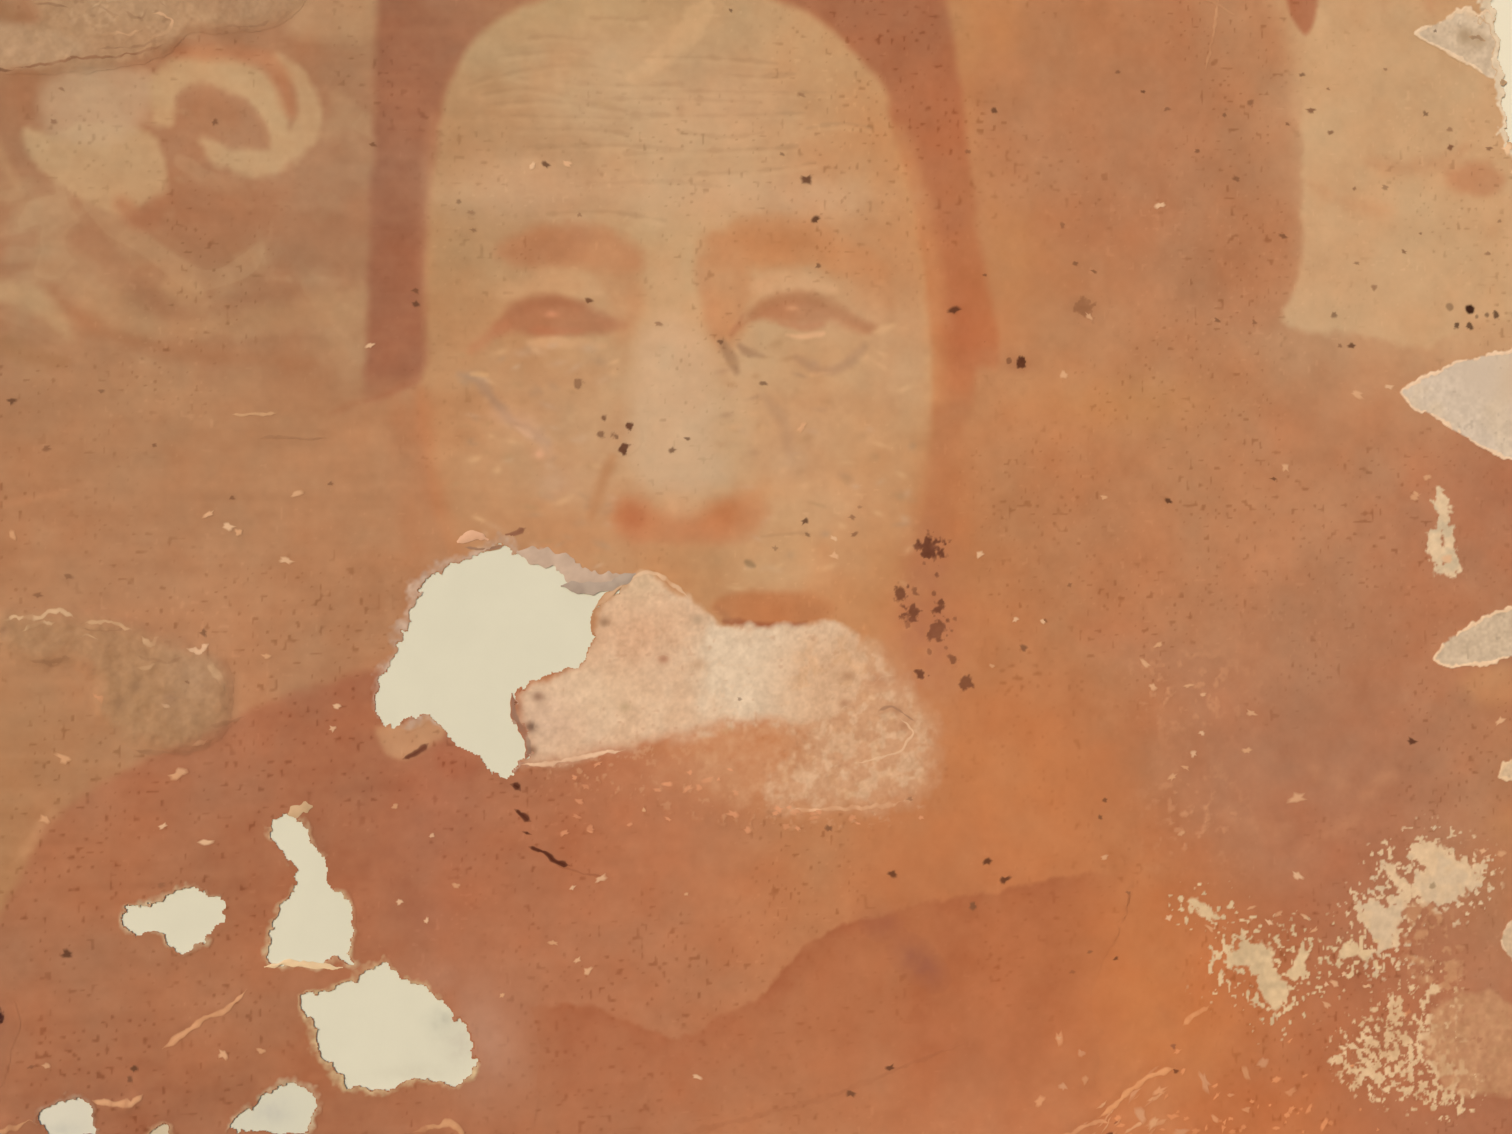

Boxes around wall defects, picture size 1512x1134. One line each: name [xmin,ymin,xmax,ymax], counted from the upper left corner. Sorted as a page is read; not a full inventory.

crack [0,43,167,73]
peeling [1414,5,1497,79]
peeling [1384,346,1512,460]
peeling [1409,474,1464,580]
flaking render [375,543,621,779]
peeling [1432,605,1512,669]
peeling [1497,758,1512,782]
flaking render [121,887,226,954]
flaking render [266,813,478,1091]
peeling [1114,813,1512,1134]
flaking render [38,1097,96,1134]
flaking render [230,1083,317,1134]